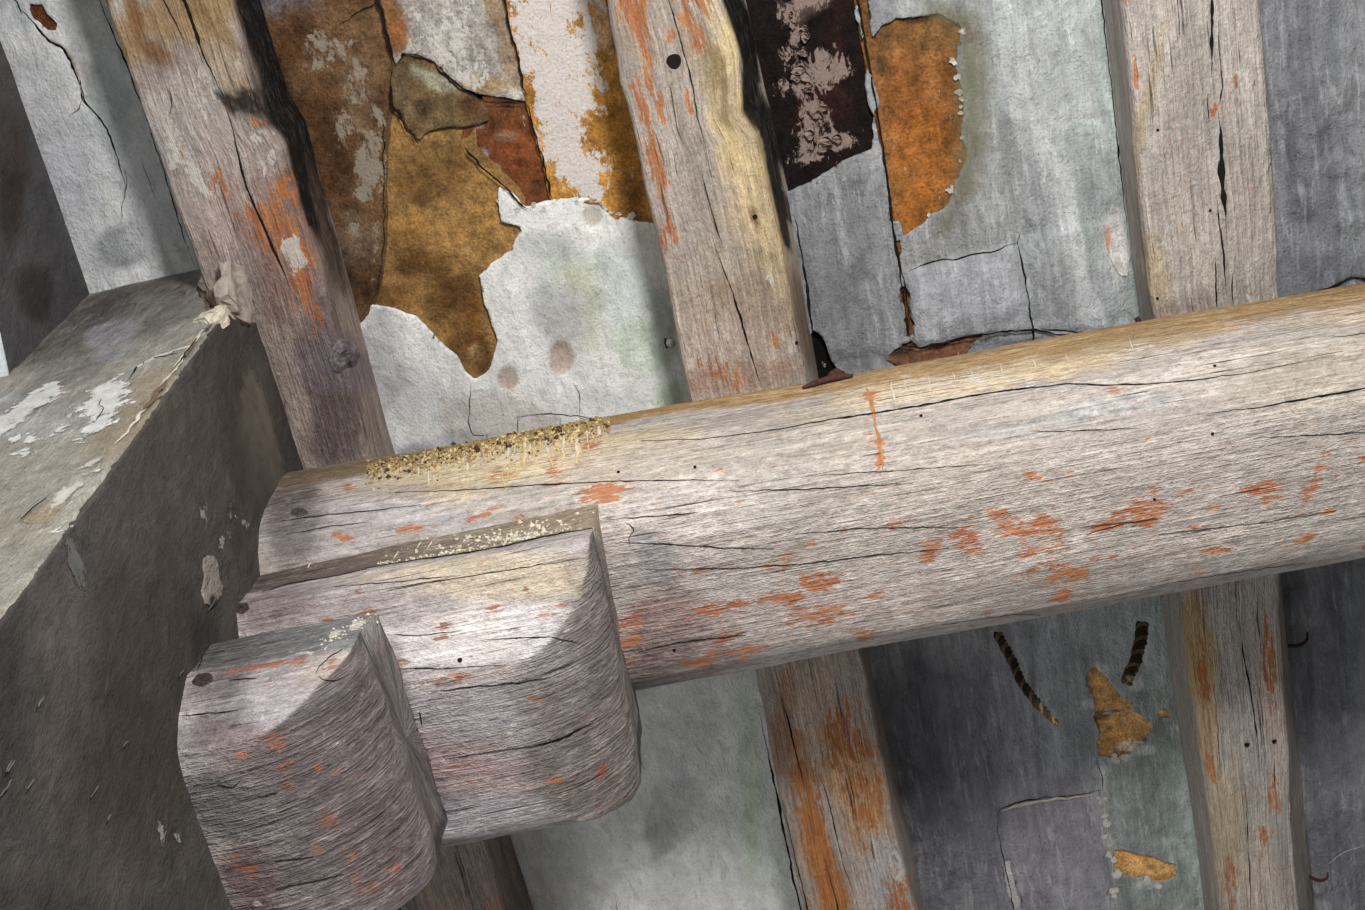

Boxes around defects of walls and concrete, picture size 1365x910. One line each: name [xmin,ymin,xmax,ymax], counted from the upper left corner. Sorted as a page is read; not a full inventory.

crack [15,0,195,266]
spalling [0,260,254,459]
flaking render [260,0,654,378]
flaking render [861,13,966,235]
crack [894,235,1083,341]
crack [1318,277,1365,291]
flaking render [1086,667,1170,764]
flaking render [1111,850,1177,889]